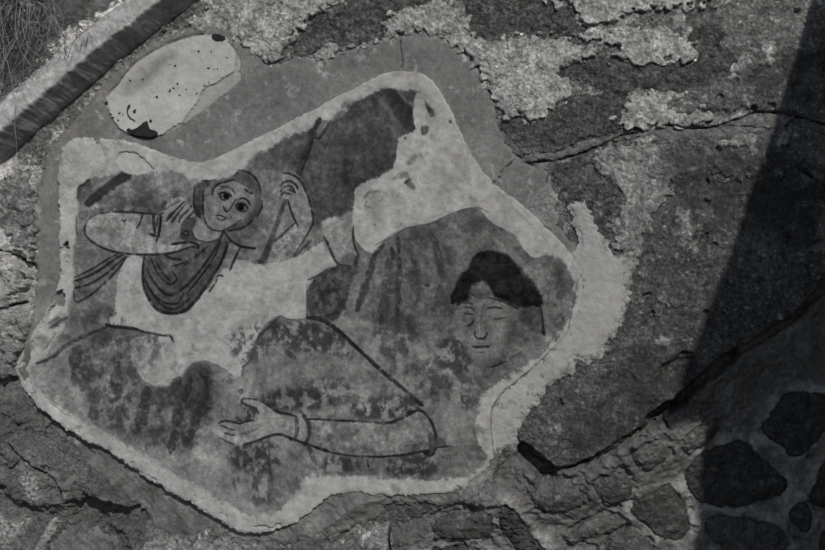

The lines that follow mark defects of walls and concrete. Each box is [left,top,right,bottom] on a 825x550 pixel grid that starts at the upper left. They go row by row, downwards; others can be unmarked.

spalling [293,0,433,56]
spalling [464,0,587,41]
crack [667,111,825,129]
crack [0,444,62,495]